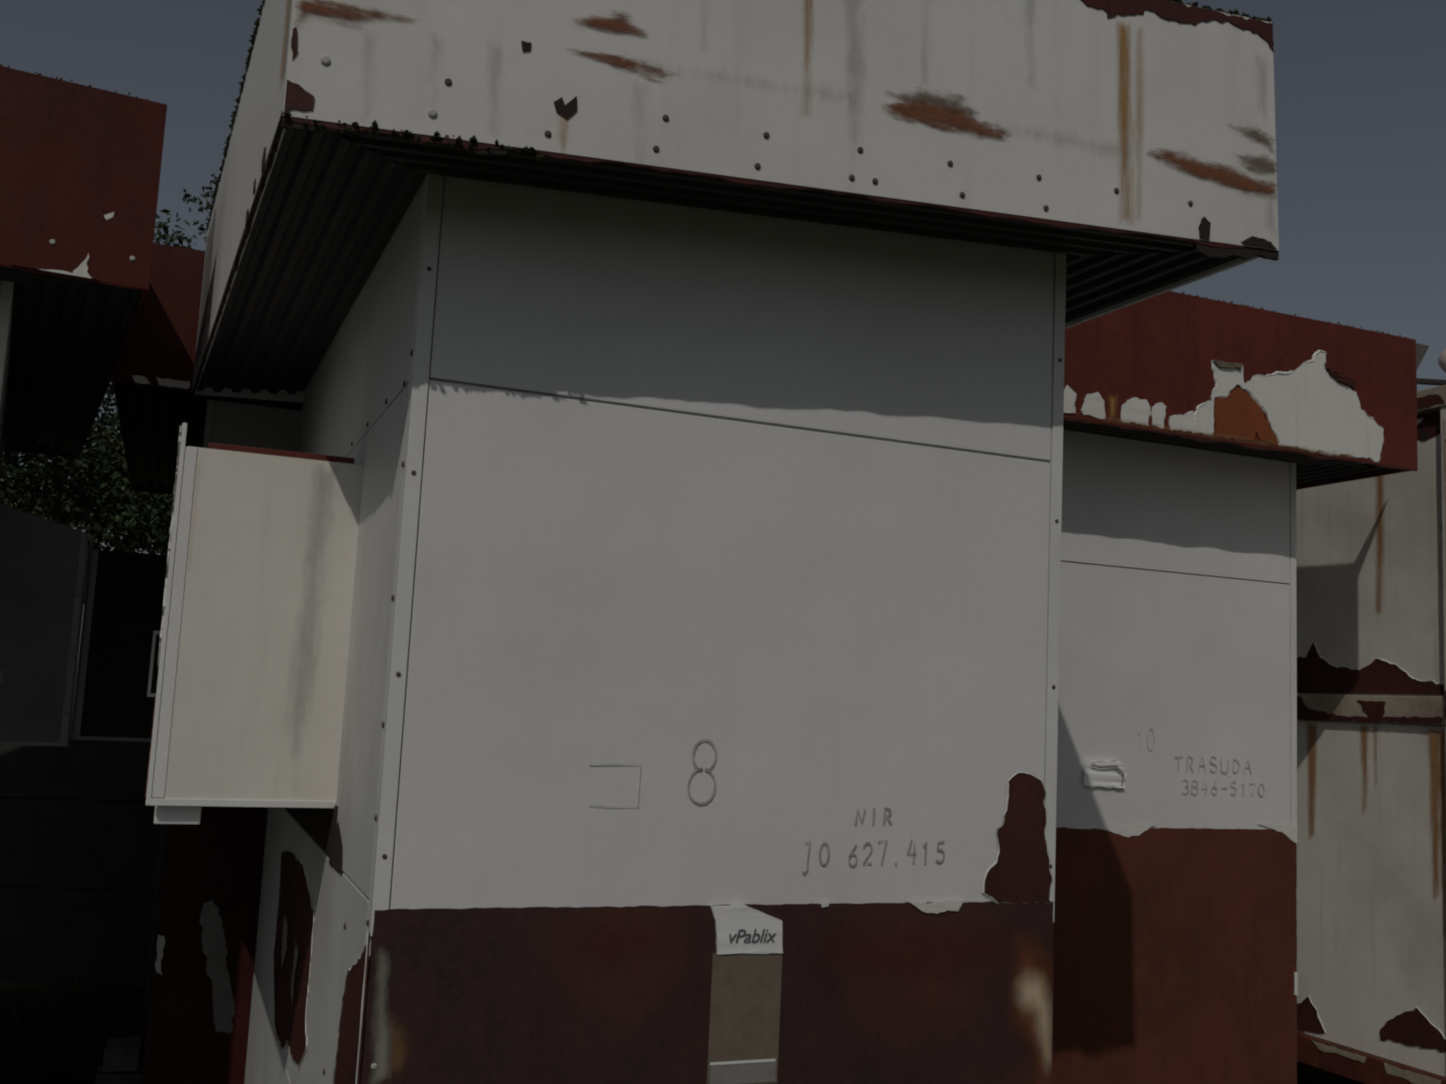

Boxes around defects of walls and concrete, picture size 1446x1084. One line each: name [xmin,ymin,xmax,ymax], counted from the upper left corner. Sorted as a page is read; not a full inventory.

rust [191,0,1279,395]
peeling [1064,350,1384,463]
rust [1297,641,1446,925]